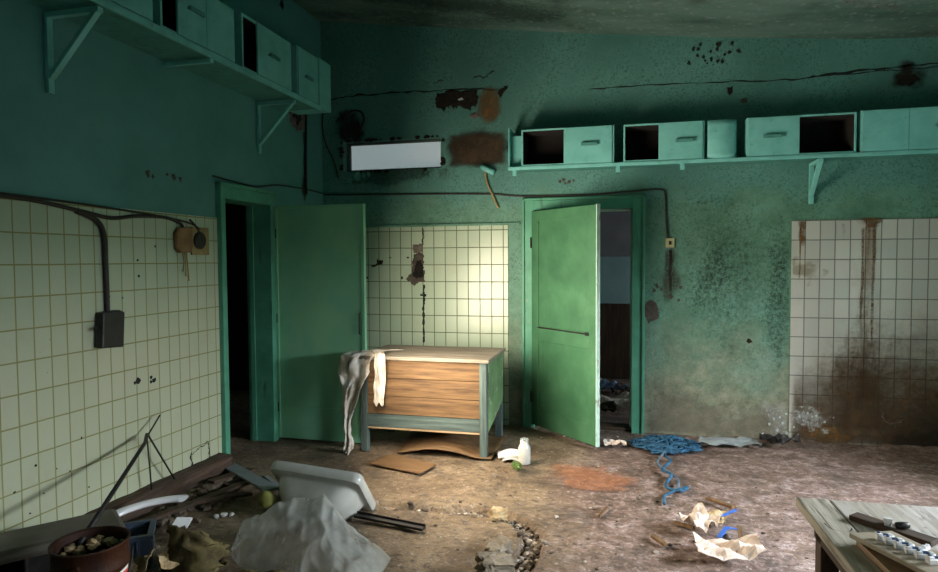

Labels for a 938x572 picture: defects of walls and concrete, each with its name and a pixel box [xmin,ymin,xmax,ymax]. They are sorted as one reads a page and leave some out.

crack [591,63,938,90]
spalling [435,89,480,118]
spalling [338,137,402,184]
spalling [401,244,425,286]
water stain [663,250,680,298]
corrosion [860,218,881,337]
water stain [766,357,938,447]